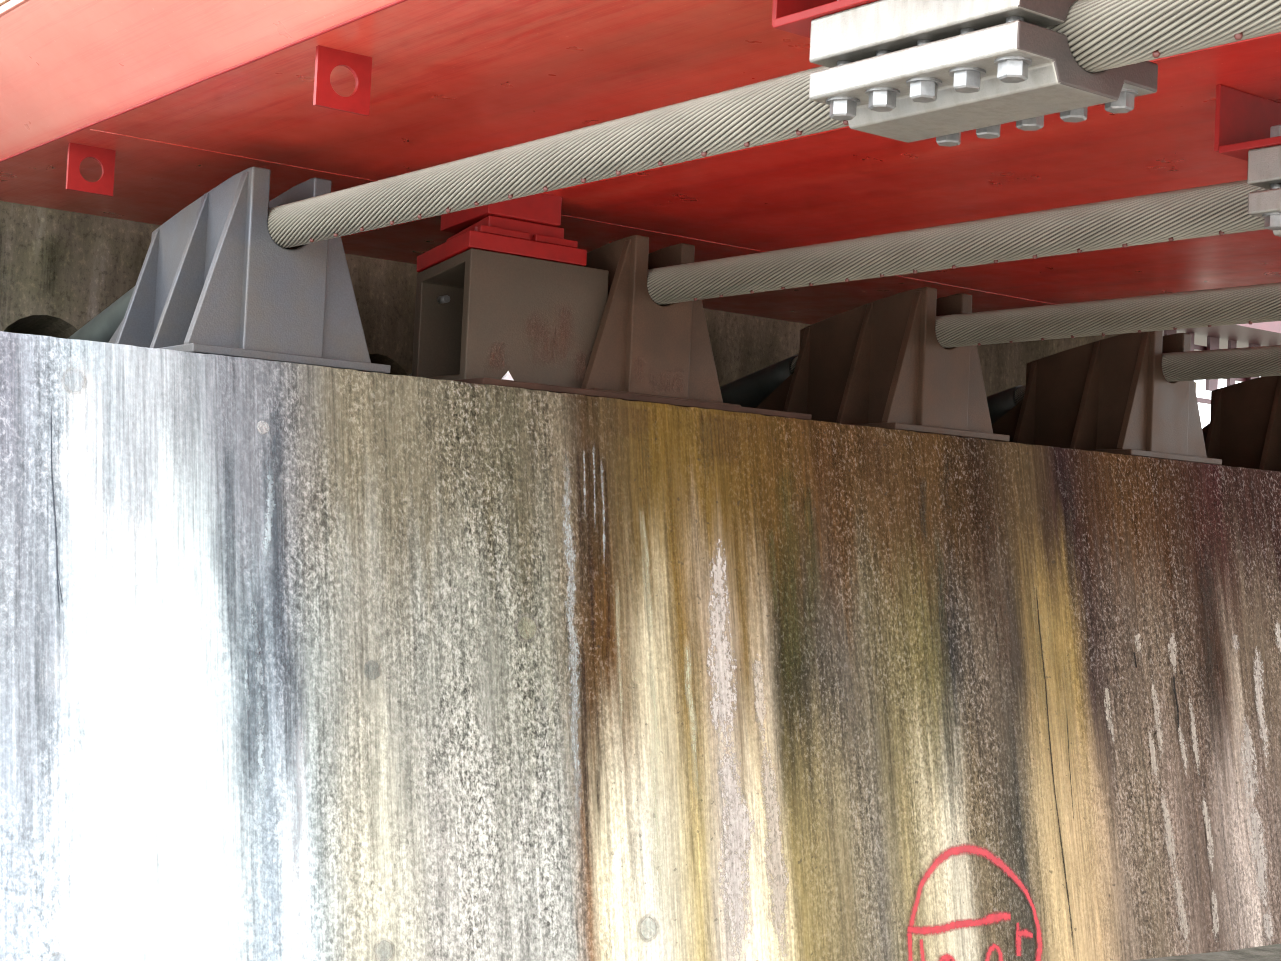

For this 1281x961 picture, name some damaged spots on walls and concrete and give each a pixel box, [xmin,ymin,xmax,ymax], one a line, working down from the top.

leakage [216,417,283,783]
leakage [685,648,696,752]
leakage [939,609,954,776]
crack [1036,593,1074,944]